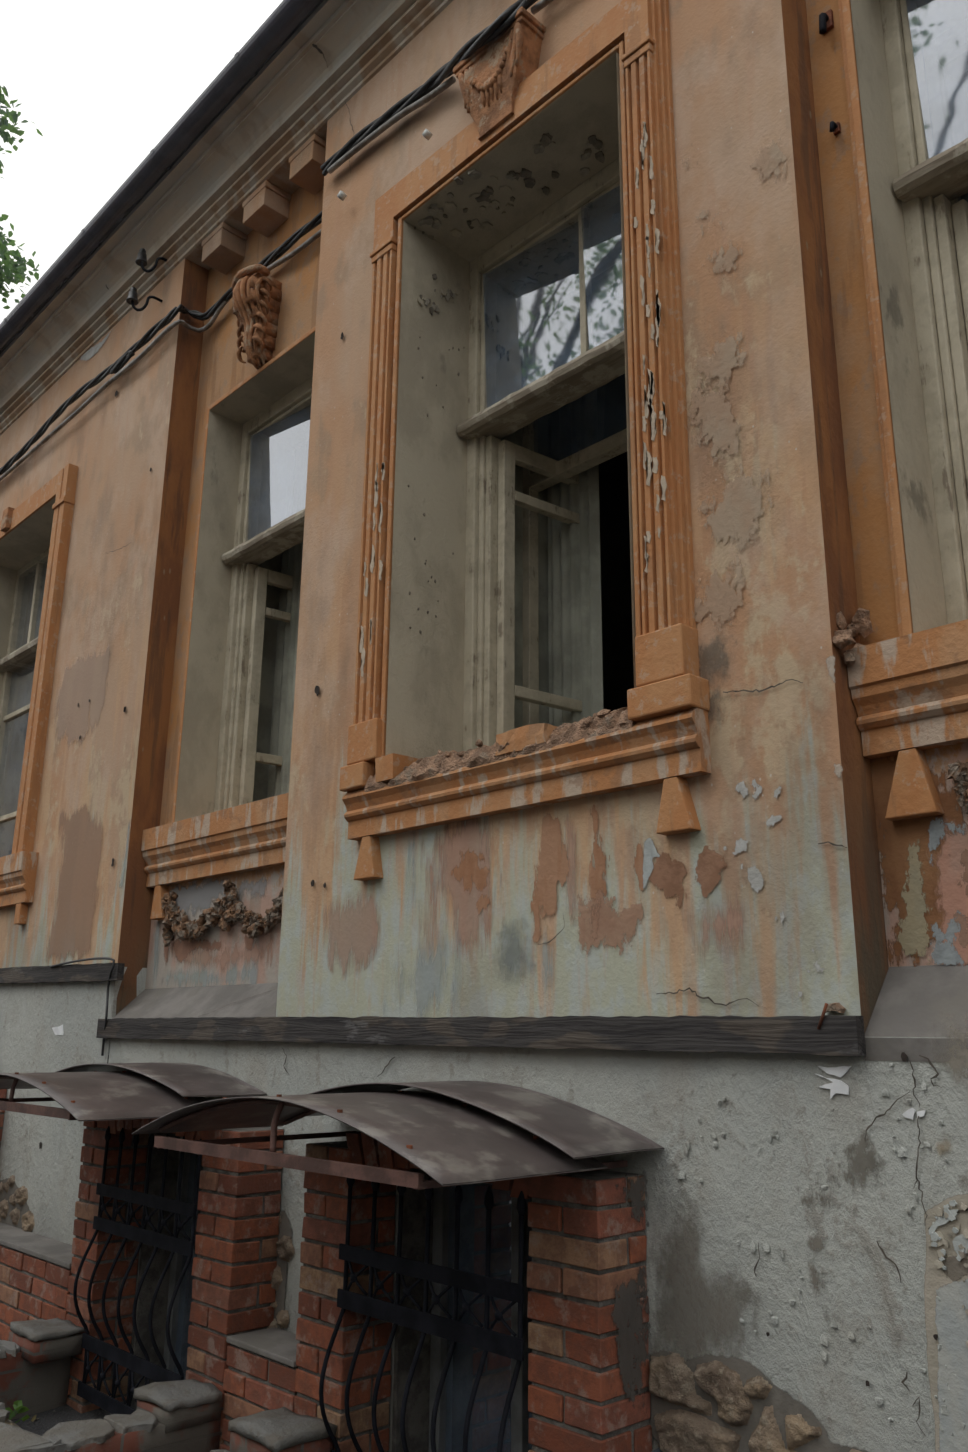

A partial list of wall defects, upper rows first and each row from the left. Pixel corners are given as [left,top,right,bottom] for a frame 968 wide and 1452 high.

peeling [414,133,559,241]
peeling [633,122,667,573]
crack [723,679,803,693]
peeling [643,838,660,888]
peeling [723,837,764,894]
peeling [896,817,966,967]
crack [657,987,758,1006]
crack [864,1055,968,1229]
leakage [611,1219,750,1408]
peeling [924,1194,968,1452]